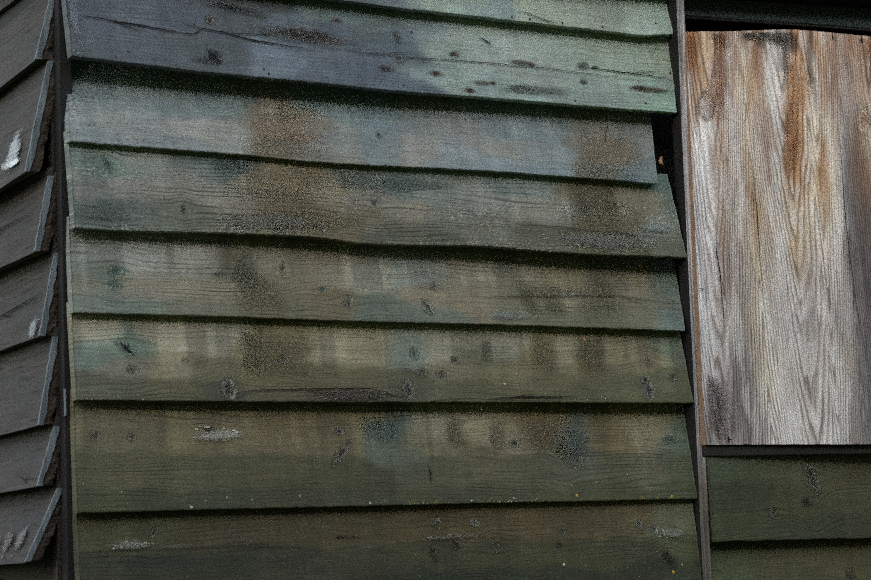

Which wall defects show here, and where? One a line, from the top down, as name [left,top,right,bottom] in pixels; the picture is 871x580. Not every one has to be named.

crack [83,15,669,79]
peeling [193,426,239,441]
peeling [112,541,148,549]